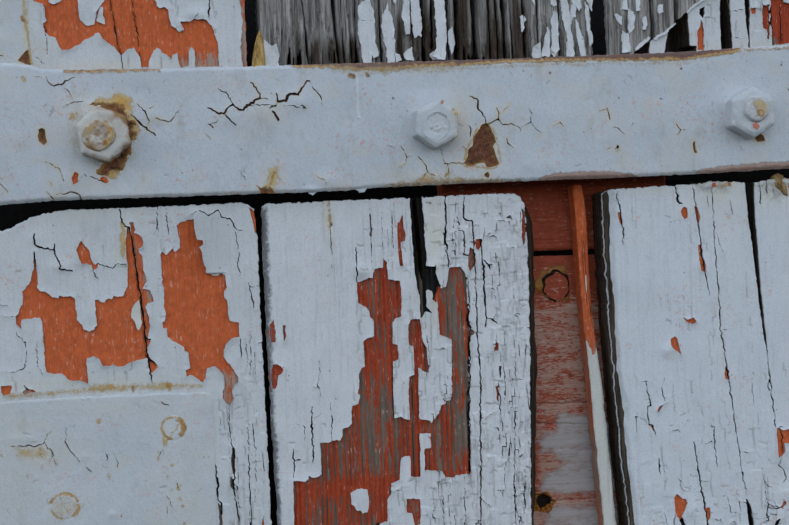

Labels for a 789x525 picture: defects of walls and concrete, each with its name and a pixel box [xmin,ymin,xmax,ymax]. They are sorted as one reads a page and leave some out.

peeling [33,0,219,68]
peeling [358,0,422,63]
rust [91,94,140,179]
rust [412,124,502,186]
peeling [16,222,158,384]
peeling [160,219,240,405]
crack [355,212,394,282]
peeling [293,239,480,525]
crack [411,198,419,271]
crack [442,195,517,525]
crack [644,381,717,525]
crack [675,181,786,516]